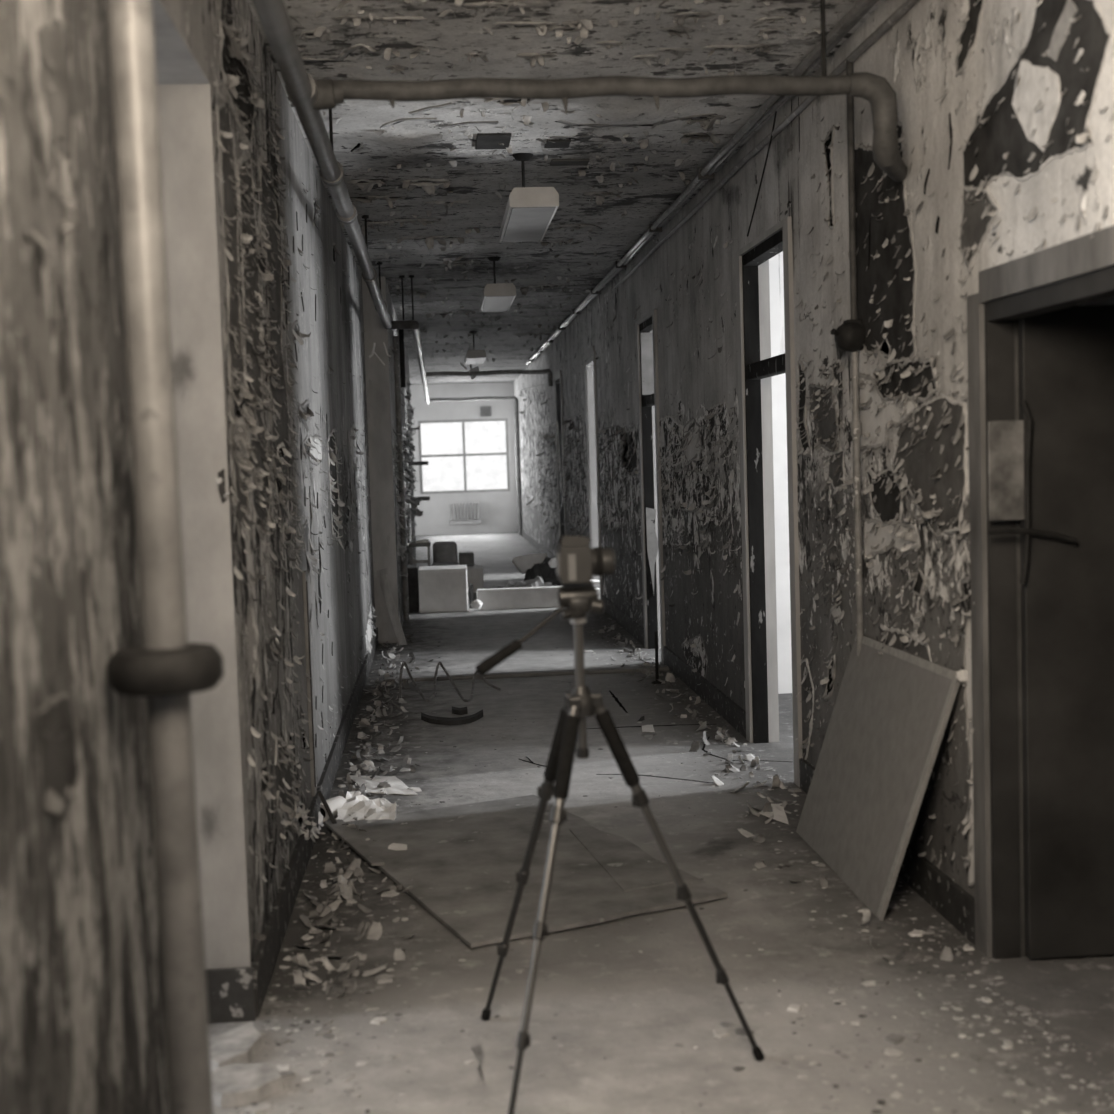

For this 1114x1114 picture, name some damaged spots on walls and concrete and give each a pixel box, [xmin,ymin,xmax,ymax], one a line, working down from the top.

peeling [298,0,429,43]
peeling [445,0,623,50]
peeling [653,12,792,58]
peeling [489,98,535,106]
peeling [679,116,727,147]
peeling [822,125,835,229]
peeling [954,0,1112,273]
peeling [215,18,364,577]
peeling [848,143,967,563]
peeling [654,398,730,513]
peeling [797,358,845,494]
peeling [908,568,926,599]